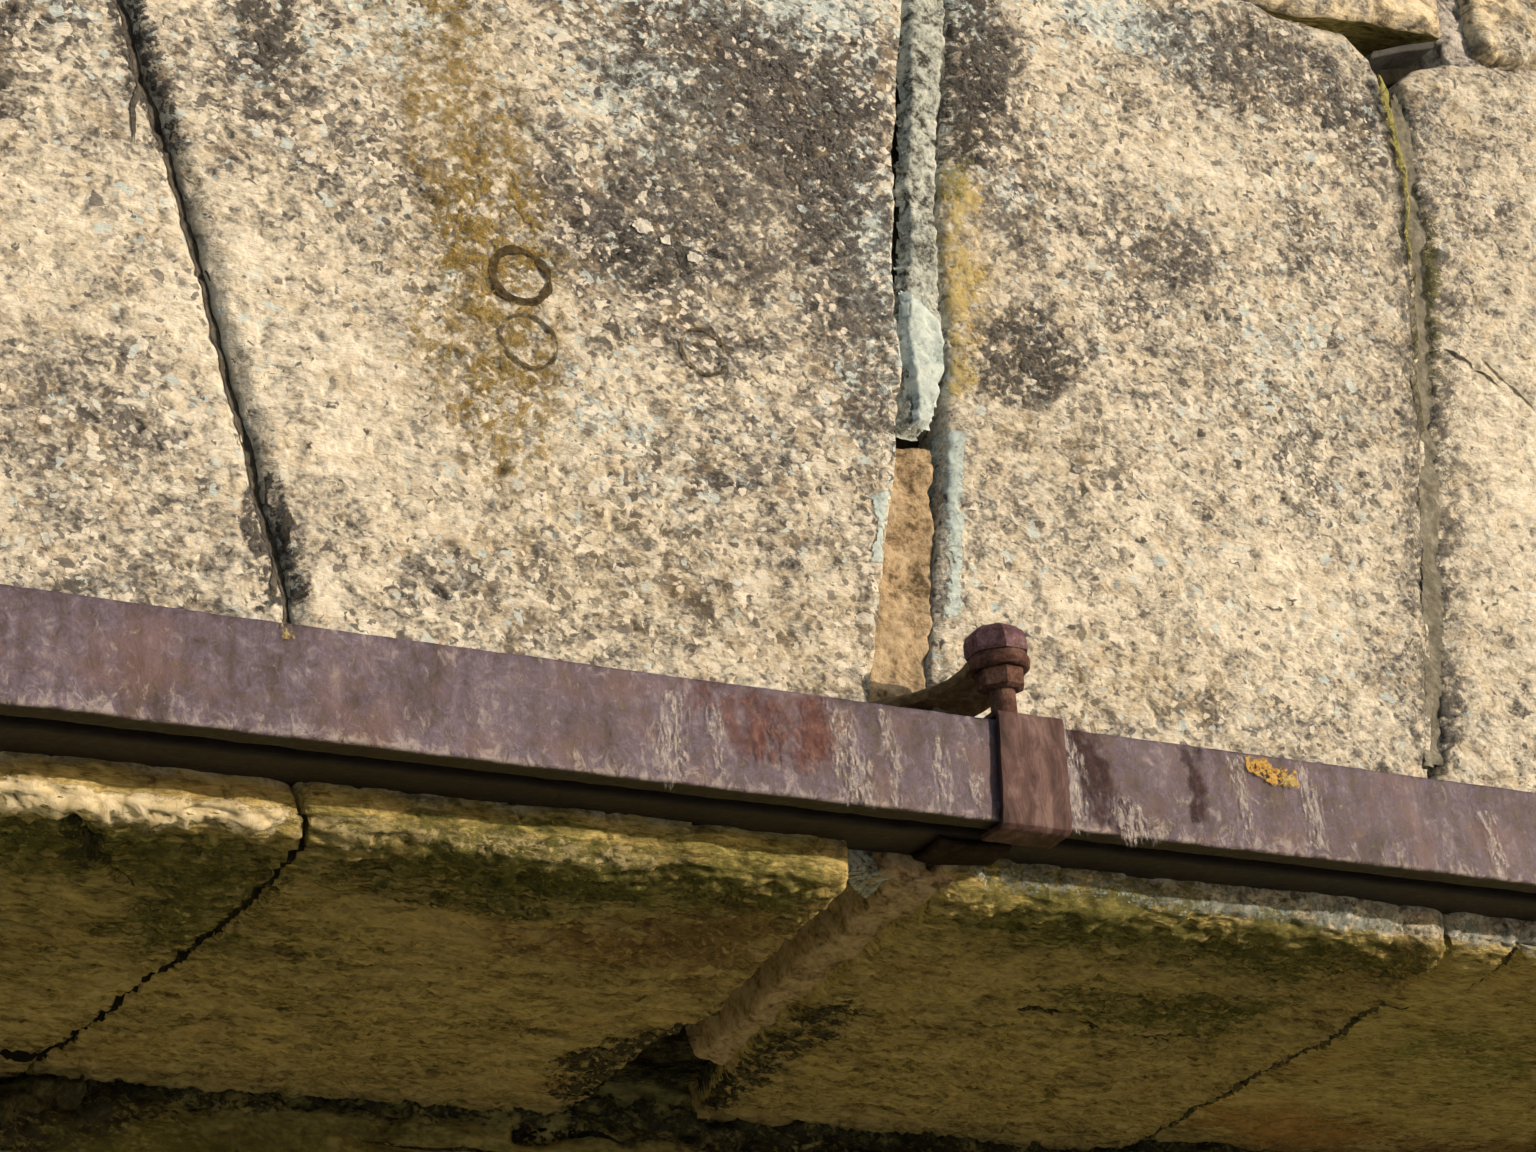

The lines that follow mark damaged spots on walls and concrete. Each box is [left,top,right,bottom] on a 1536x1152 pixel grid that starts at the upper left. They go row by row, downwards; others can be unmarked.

crack [60,813,135,887]
crack [0,845,306,1062]
crack [1468,943,1536,990]
damp [0,995,1265,1152]
crack [1145,1001,1409,1139]